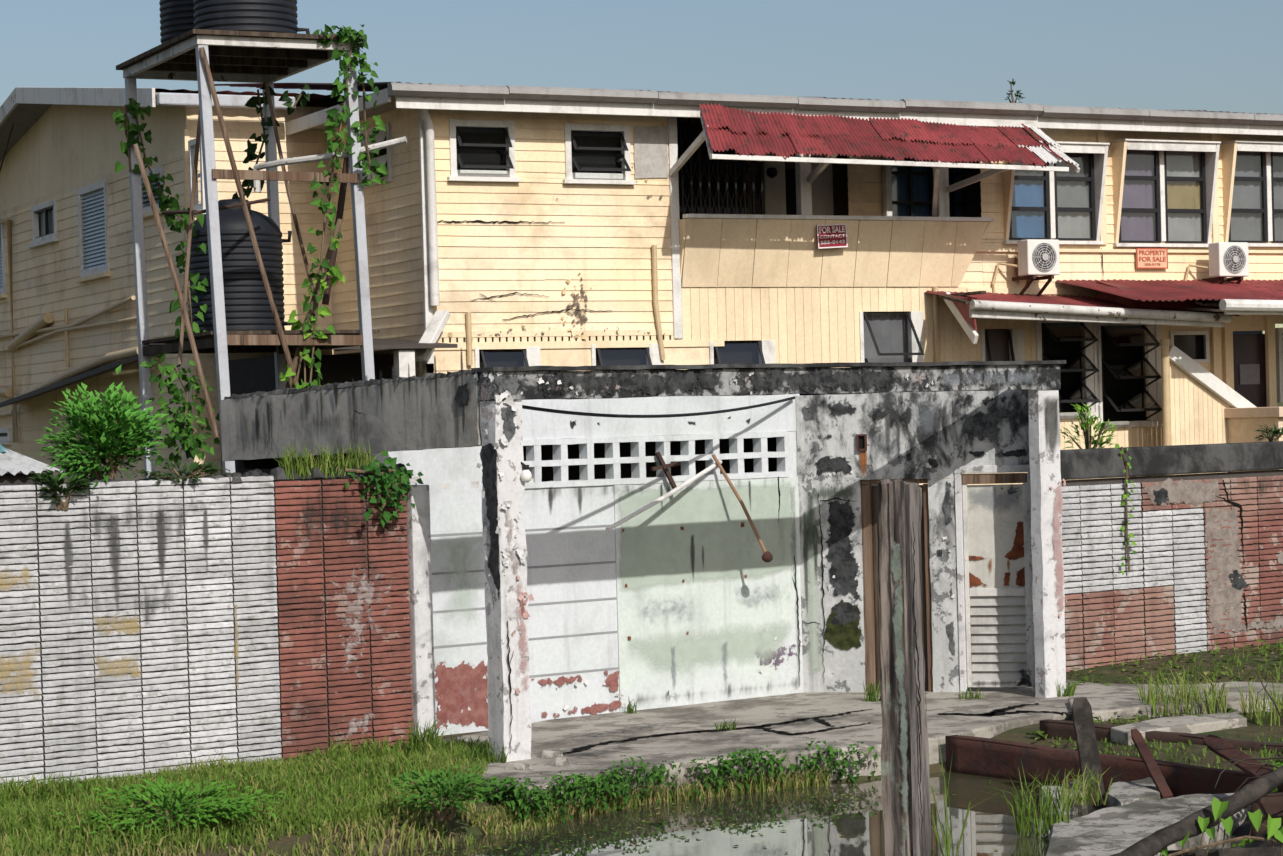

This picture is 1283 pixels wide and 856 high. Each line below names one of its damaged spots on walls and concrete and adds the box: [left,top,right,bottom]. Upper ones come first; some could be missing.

crack [437,217,562,225]
crack [474,292,610,320]
mould [538,369,721,397]
leakage [64,522,72,599]
leakage [95,511,184,634]
peeling [224,370,627,718]
leakage [619,481,852,670]
crack [792,494,855,687]
spalling [1144,478,1283,637]
peeling [343,713,375,735]
peeling [434,661,488,729]
crack [562,709,873,754]